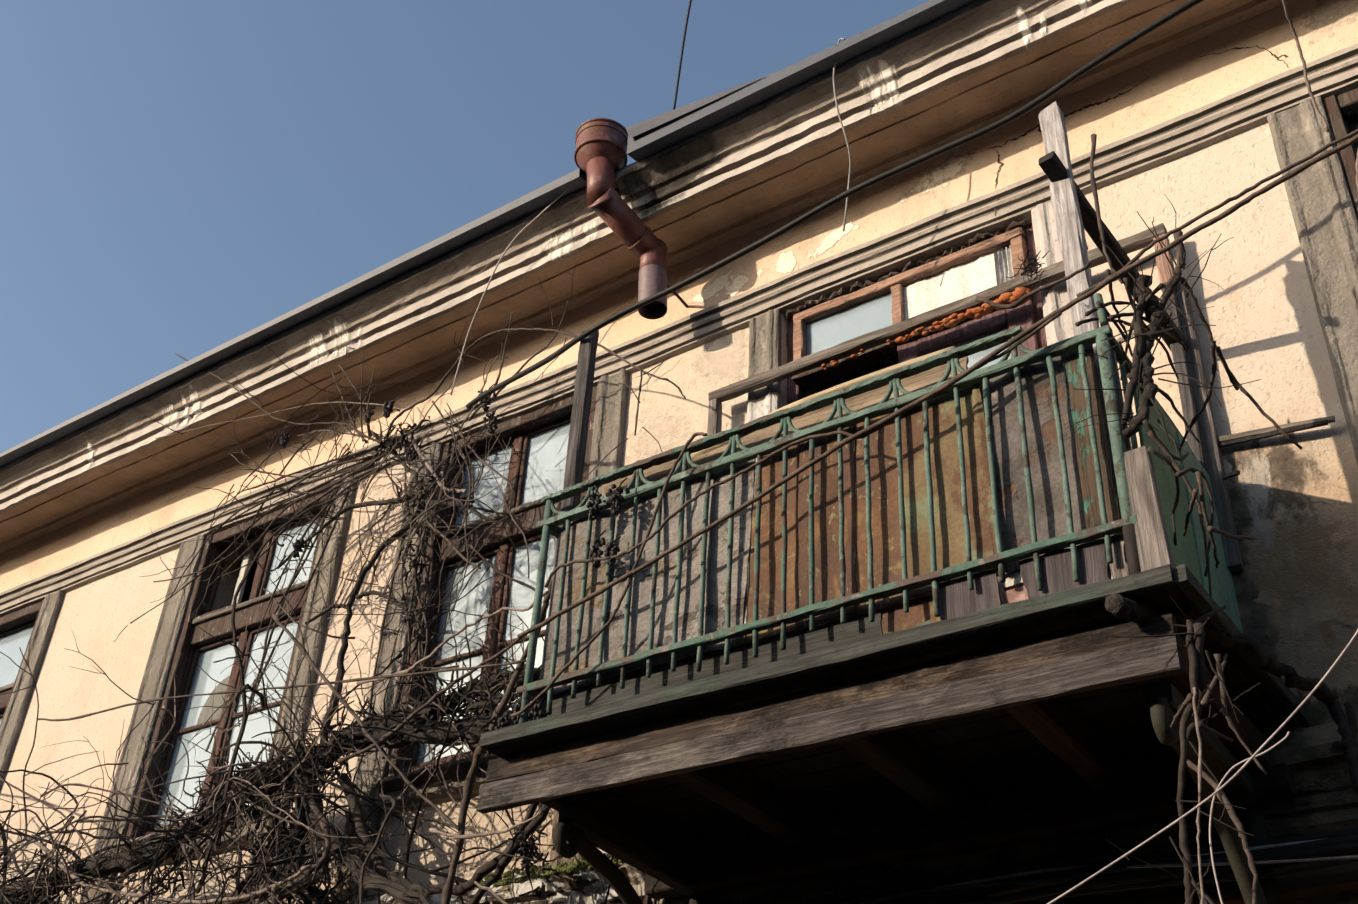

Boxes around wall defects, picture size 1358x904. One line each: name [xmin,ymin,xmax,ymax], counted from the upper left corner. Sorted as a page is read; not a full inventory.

crack [1193,45,1289,68]
water stain [1228,419,1317,662]